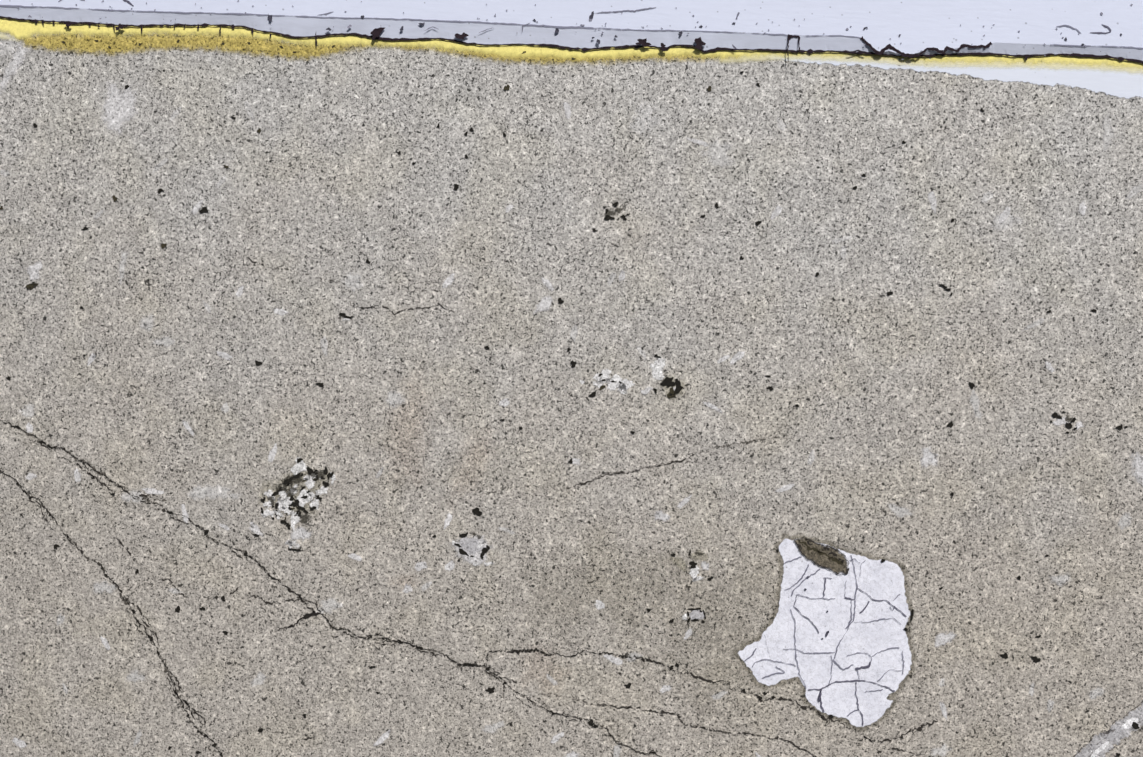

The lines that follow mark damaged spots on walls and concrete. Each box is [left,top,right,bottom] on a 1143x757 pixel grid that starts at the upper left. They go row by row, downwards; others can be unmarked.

peeling [773,58,1143,99]
spalling [249,457,336,551]
crack [0,420,938,757]
spalling [738,537,914,727]
crack [1073,701,1143,757]